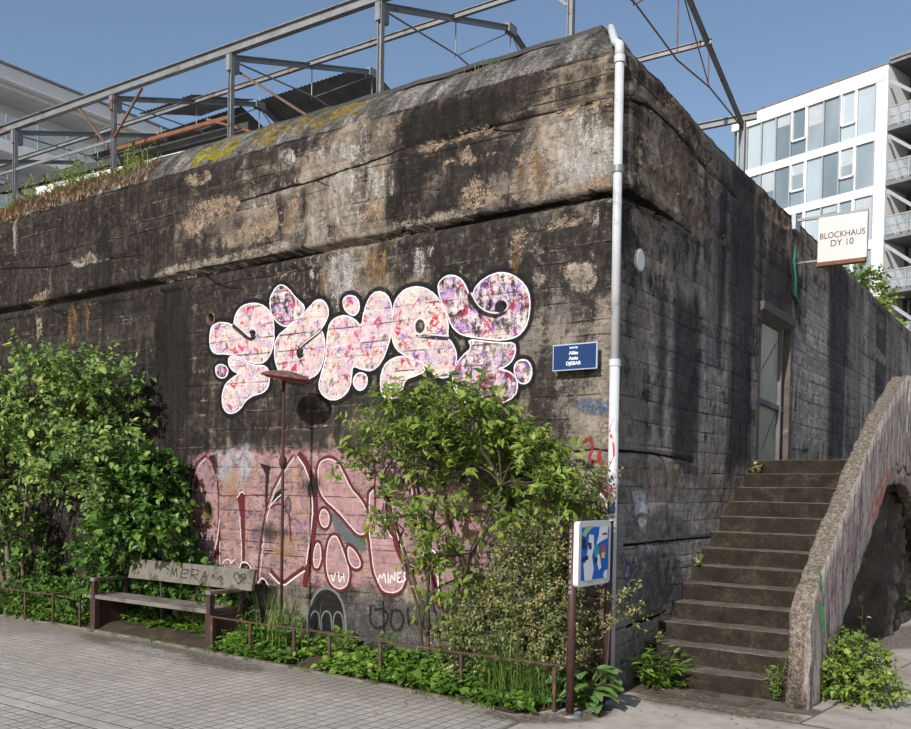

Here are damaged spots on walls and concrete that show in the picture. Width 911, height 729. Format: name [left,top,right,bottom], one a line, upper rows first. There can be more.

damp [369,91,503,225]
crack [203,97,736,214]
damp [556,79,595,107]
damp [556,114,613,204]
crack [0,189,691,316]
damp [657,144,911,474]